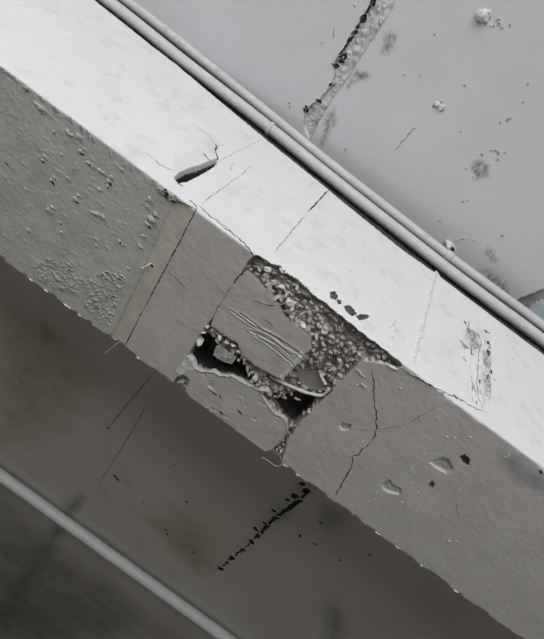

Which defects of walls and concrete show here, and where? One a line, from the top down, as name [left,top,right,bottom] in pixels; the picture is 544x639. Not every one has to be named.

peeling [350,0,386,42]
peeling [332,51,350,70]
peeling [303,98,324,132]
crack [202,139,261,171]
spalling [176,164,215,183]
crack [274,189,329,253]
crack [125,166,256,346]
spalling [189,255,402,467]
spalling [174,375,190,388]
crack [335,365,485,496]
spalling [429,457,454,474]
spalling [380,480,402,495]